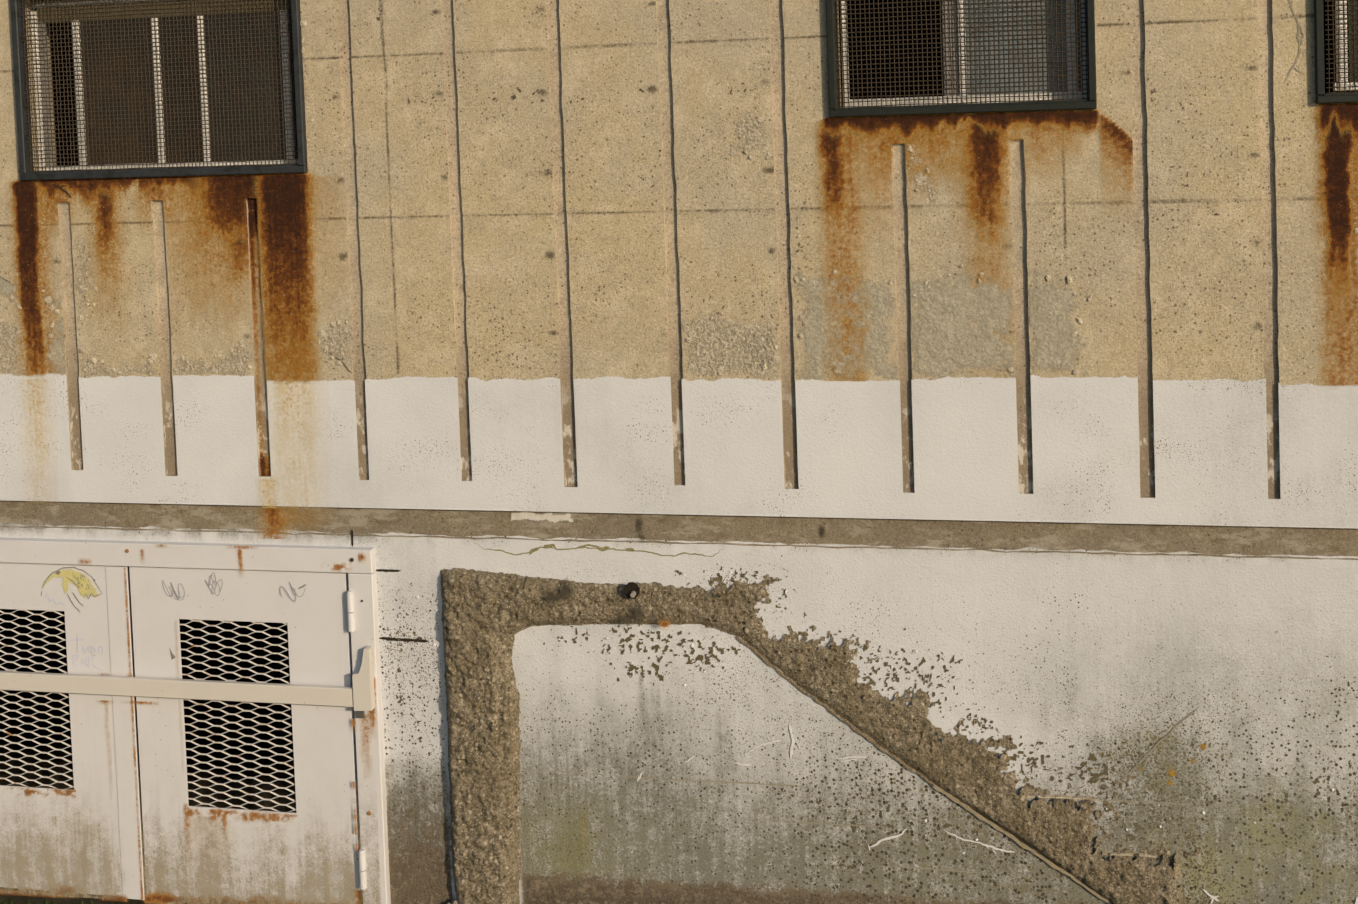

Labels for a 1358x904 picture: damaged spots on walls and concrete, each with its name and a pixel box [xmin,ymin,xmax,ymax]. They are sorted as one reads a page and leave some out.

corrosion [818,110,1133,362]
corrosion [1315,103,1358,385]
corrosion [12,173,317,539]
crack [476,543,724,557]
corrosion [352,678,376,744]
corrosion [103,830,340,904]
corrosion [184,805,297,840]
leakage [524,817,909,904]